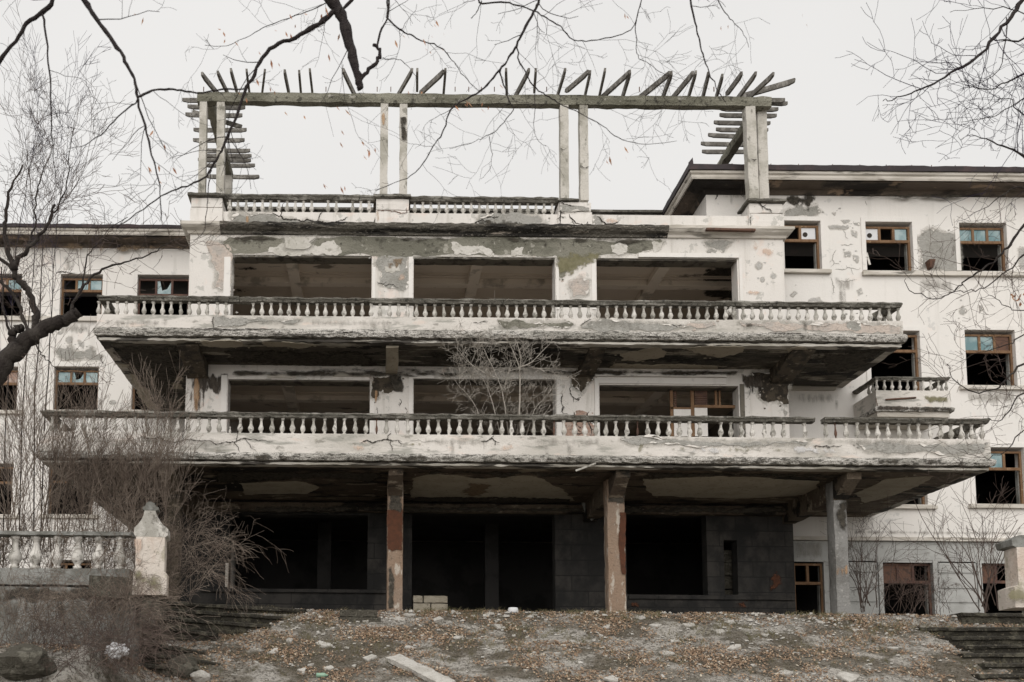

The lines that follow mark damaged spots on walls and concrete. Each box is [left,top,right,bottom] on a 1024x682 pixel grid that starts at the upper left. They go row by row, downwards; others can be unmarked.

peeling [785,204,860,237]
peeling [206,235,664,299]
peeling [917,225,957,271]
peeling [609,345,745,369]
spalling [751,370,791,415]
crack [135,420,272,452]
crack [361,399,440,449]
corrosion [387,509,403,551]
corrosion [618,512,626,574]